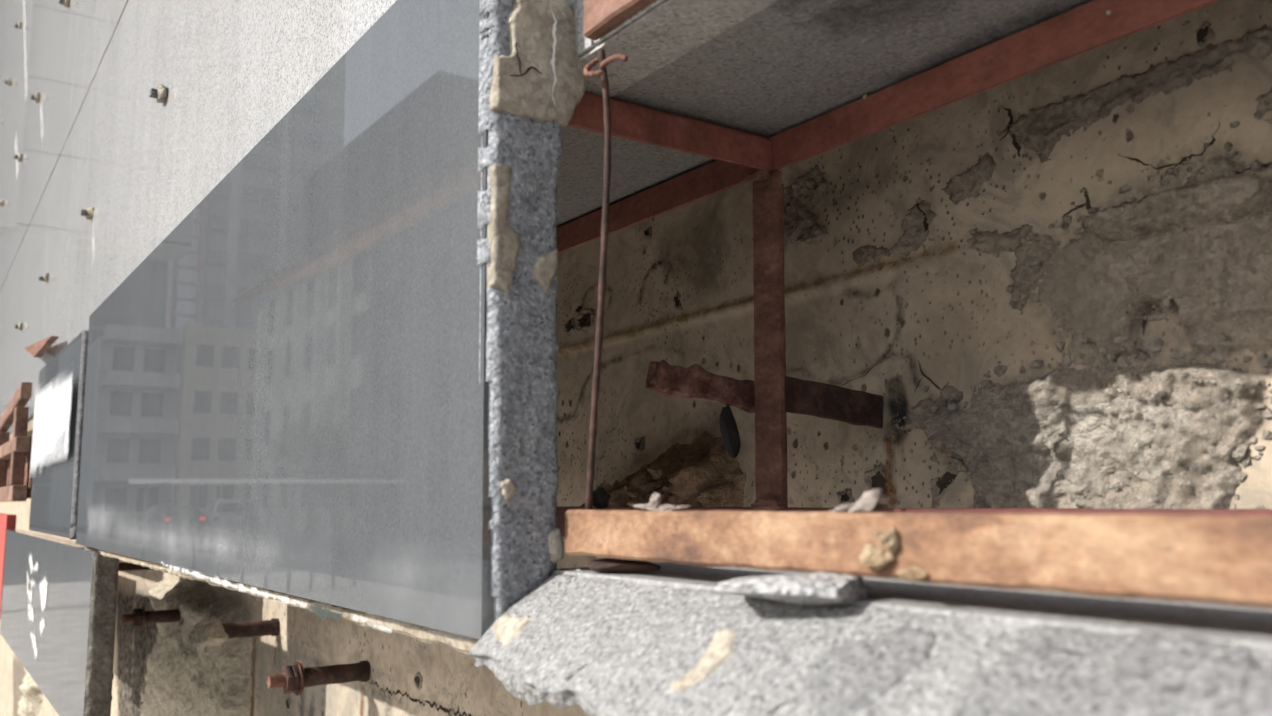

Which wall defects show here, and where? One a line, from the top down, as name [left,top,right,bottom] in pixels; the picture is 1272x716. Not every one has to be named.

crack [510,42,542,77]
peeling [996,21,1272,163]
peeling [941,152,997,205]
spalling [477,0,596,623]
peeling [852,200,937,268]
peeling [965,224,1061,315]
corrosion [884,379,907,504]
spalling [139,562,390,716]
crack [368,680,472,716]